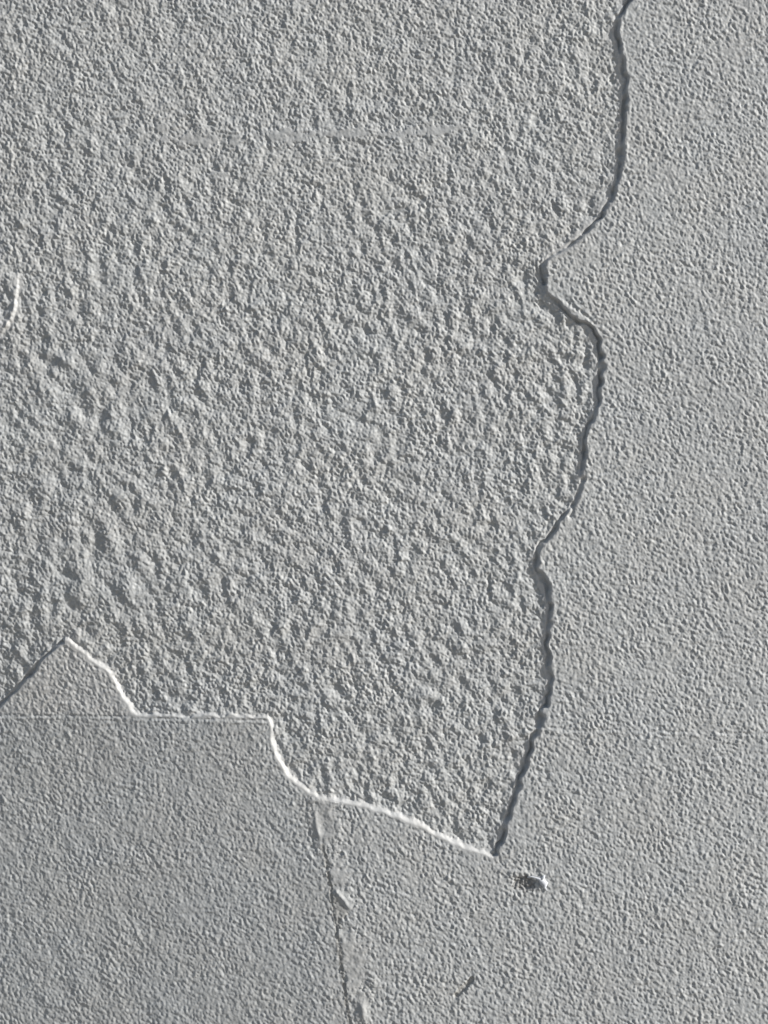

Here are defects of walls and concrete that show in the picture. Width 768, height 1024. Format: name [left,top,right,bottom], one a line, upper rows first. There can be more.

peeling [0,0,633,859]